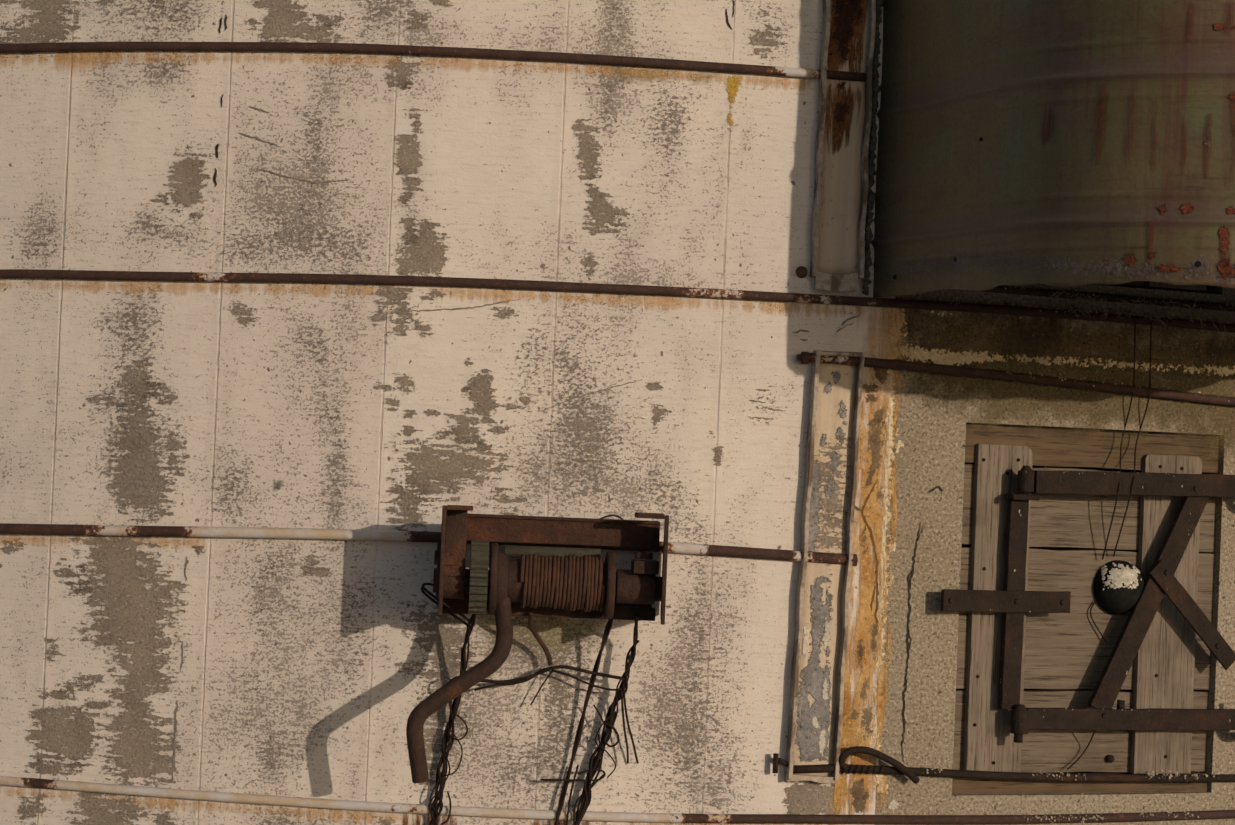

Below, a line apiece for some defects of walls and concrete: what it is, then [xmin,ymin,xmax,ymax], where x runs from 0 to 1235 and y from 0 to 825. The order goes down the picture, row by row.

peeling [0,0,216,95]
peeling [121,146,212,253]
peeling [202,69,450,338]
peeling [245,0,453,43]
peeling [572,69,718,235]
corrosion [825,0,868,154]
peeling [24,280,496,825]
peeling [373,296,772,825]
corrosion [833,392,897,815]
crack [855,479,879,634]
crack [901,522,924,762]
peeling [764,308,1235,815]